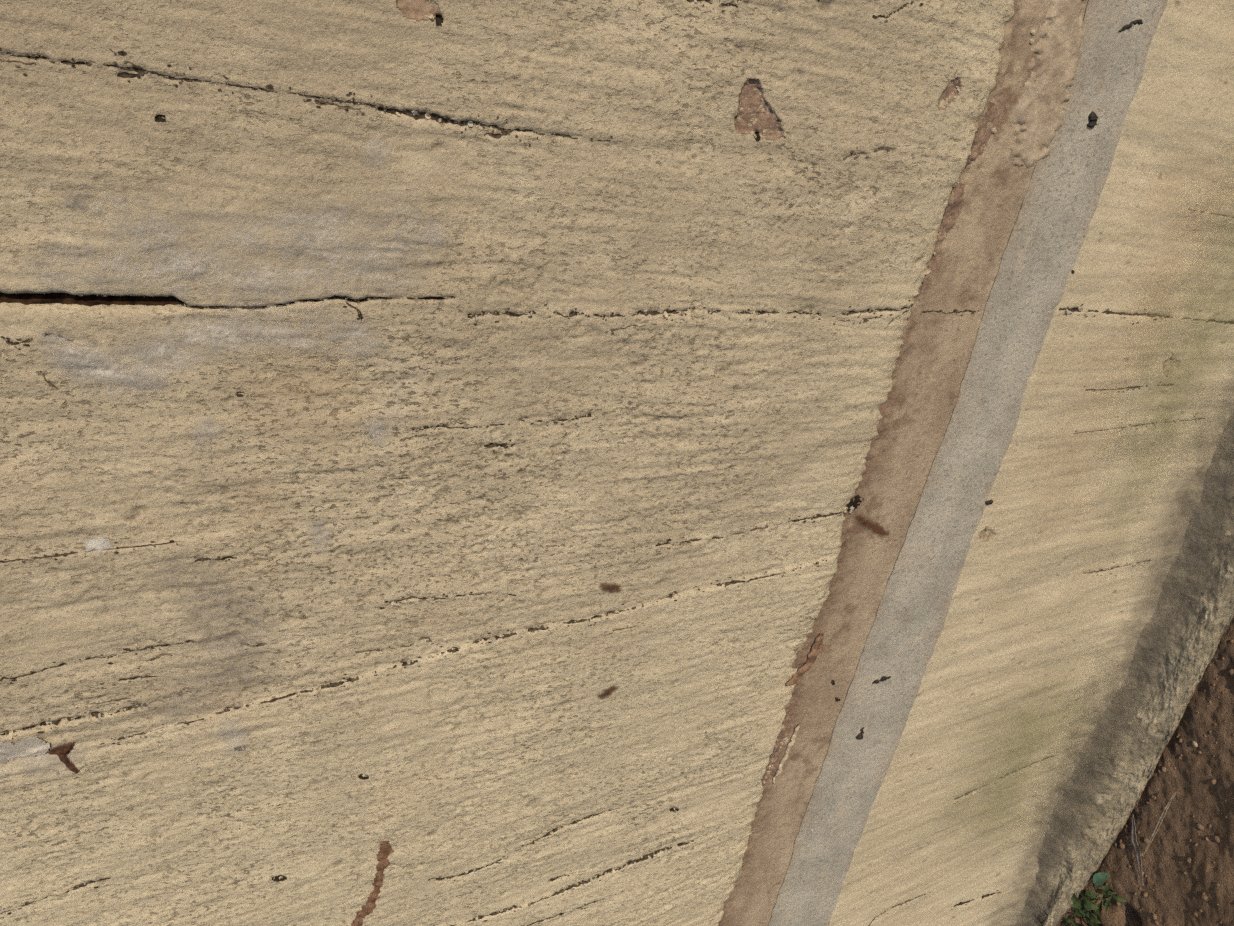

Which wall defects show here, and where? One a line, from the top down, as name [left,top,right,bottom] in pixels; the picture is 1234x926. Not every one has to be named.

crack [0,47,613,146]
crack [342,301,364,320]
crack [467,300,979,334]
crack [1,333,72,389]
crack [0,540,237,563]
crack [656,506,854,549]
crack [0,560,827,750]
rust [47,741,80,774]
crack [428,808,618,882]
rust [351,841,394,926]
crack [433,840,694,926]